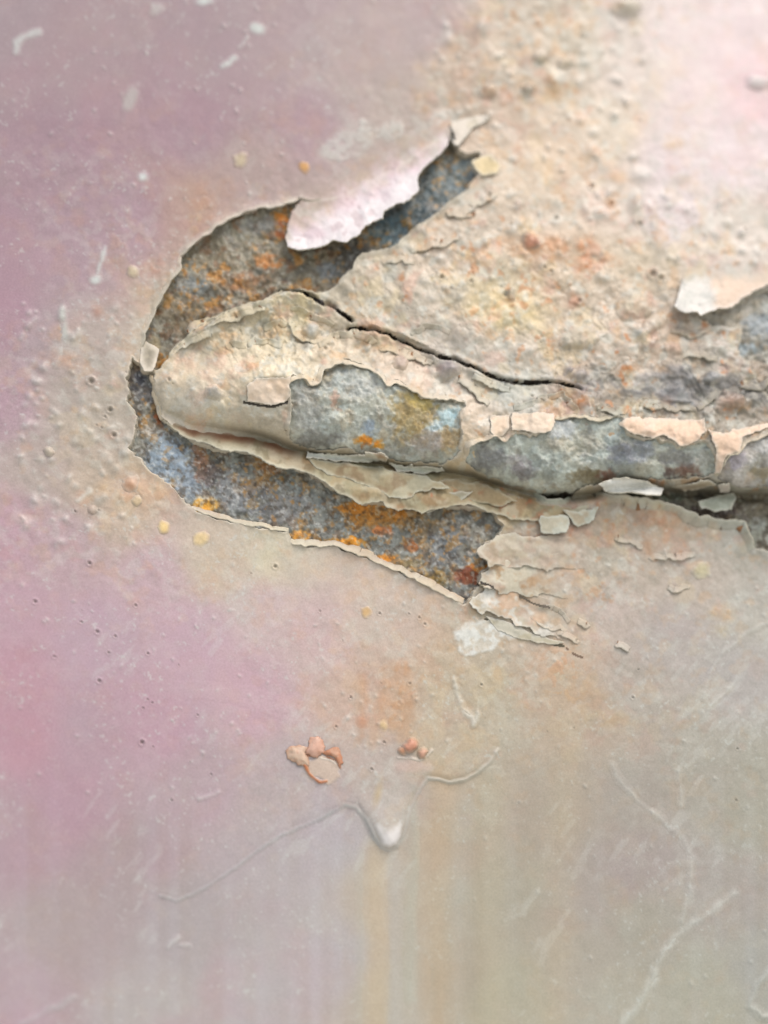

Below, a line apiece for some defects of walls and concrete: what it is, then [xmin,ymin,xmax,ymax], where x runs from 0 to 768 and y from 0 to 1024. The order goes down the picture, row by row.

crack [280,290,580,389]
peeling [128,106,768,658]
rust [89,456,172,521]